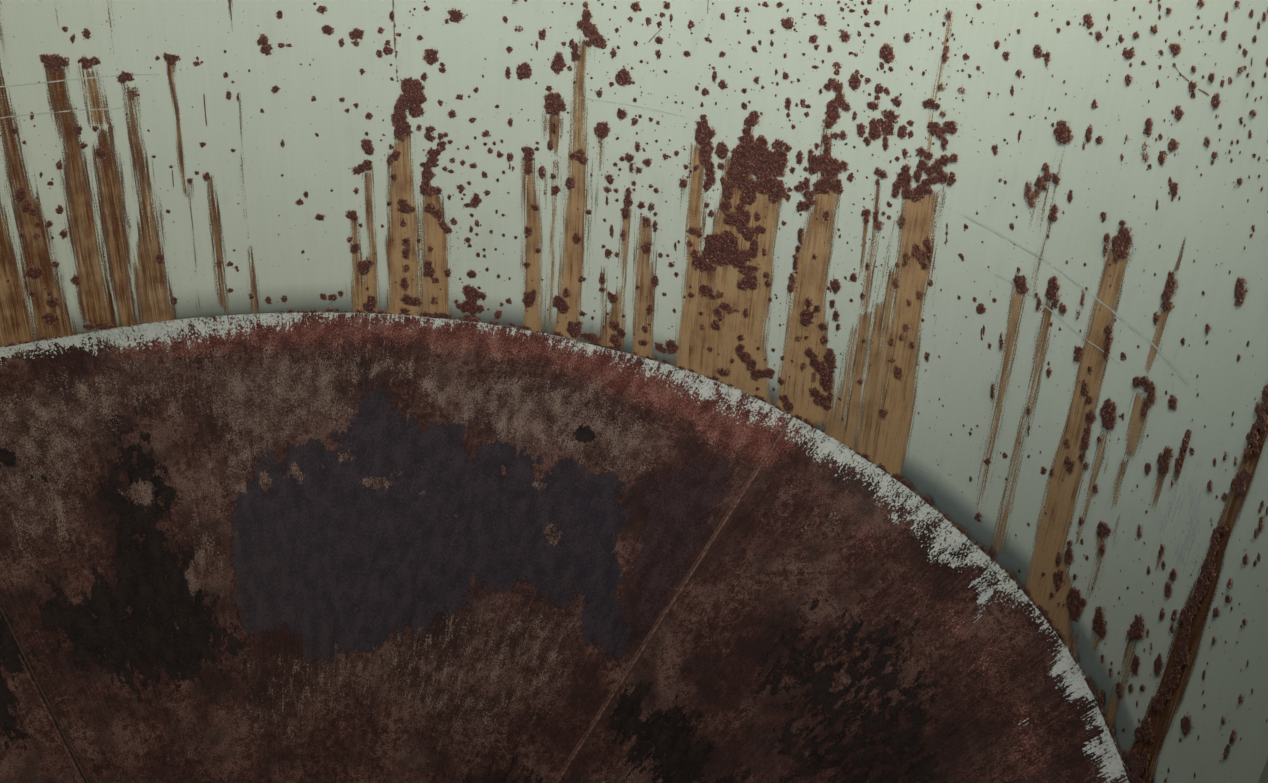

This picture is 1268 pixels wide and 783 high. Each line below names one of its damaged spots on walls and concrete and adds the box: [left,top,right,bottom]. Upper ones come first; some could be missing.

corrosion [339,97,378,120]
corrosion [438,75,484,119]
corrosion [223,72,247,218]
corrosion [1254,501,1268,539]
peeling [0,312,1130,783]
corrosion [1146,543,1177,598]
corrosion [1219,716,1241,762]